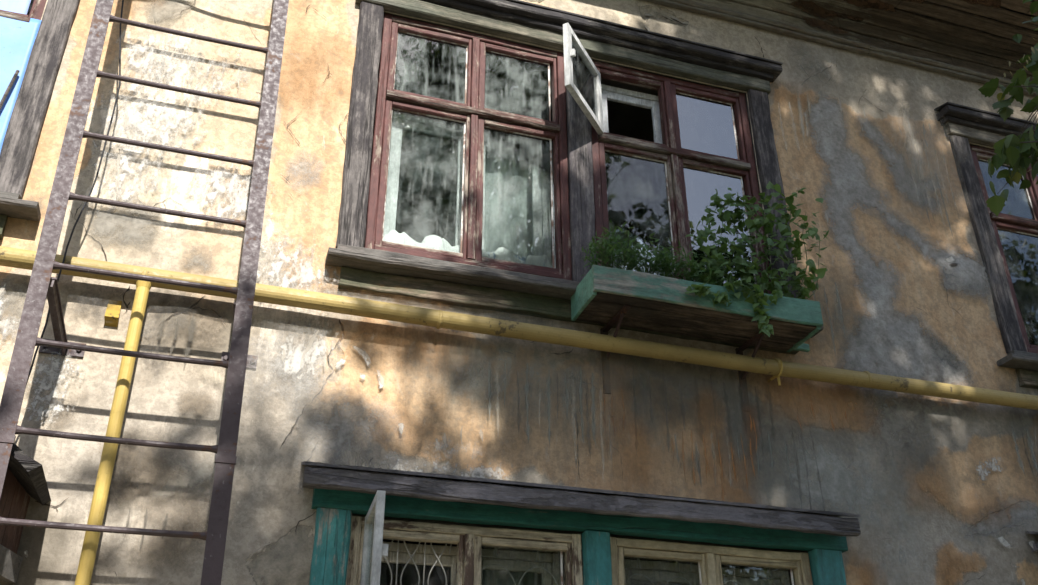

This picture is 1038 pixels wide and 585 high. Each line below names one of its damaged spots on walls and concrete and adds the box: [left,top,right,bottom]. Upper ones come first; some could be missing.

peeling [0,285,28,324]
peeling [809,96,989,384]
crack [281,319,344,461]